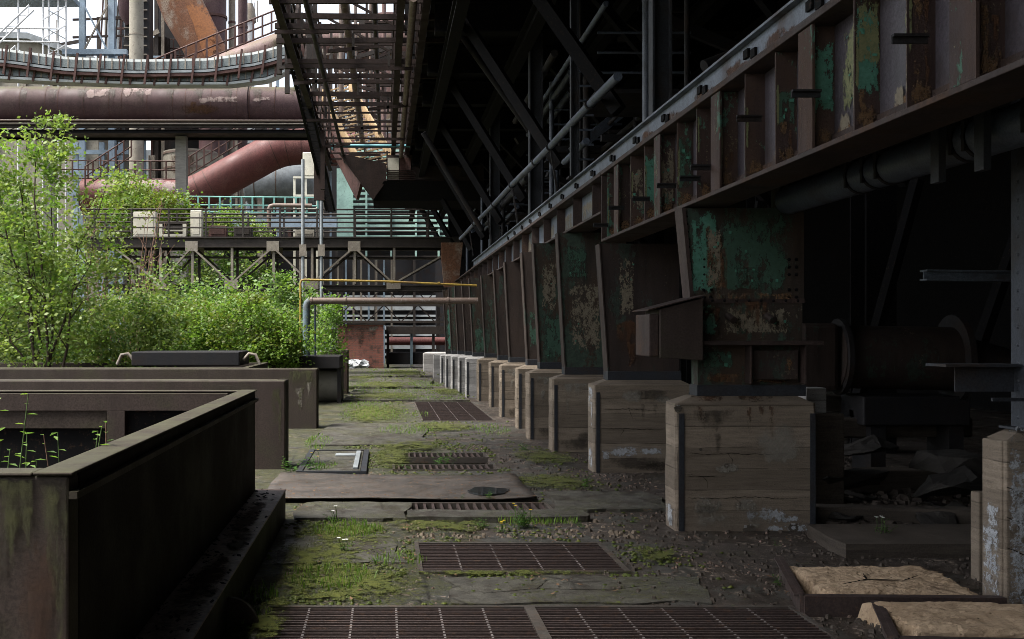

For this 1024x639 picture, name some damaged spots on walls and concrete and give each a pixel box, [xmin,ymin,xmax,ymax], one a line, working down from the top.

corrosion [185,1,216,57]
peeling [815,0,880,126]
peeling [691,210,756,293]
peeling [569,283,601,349]
efflorescence [983,450,1024,604]
crack [844,573,921,584]